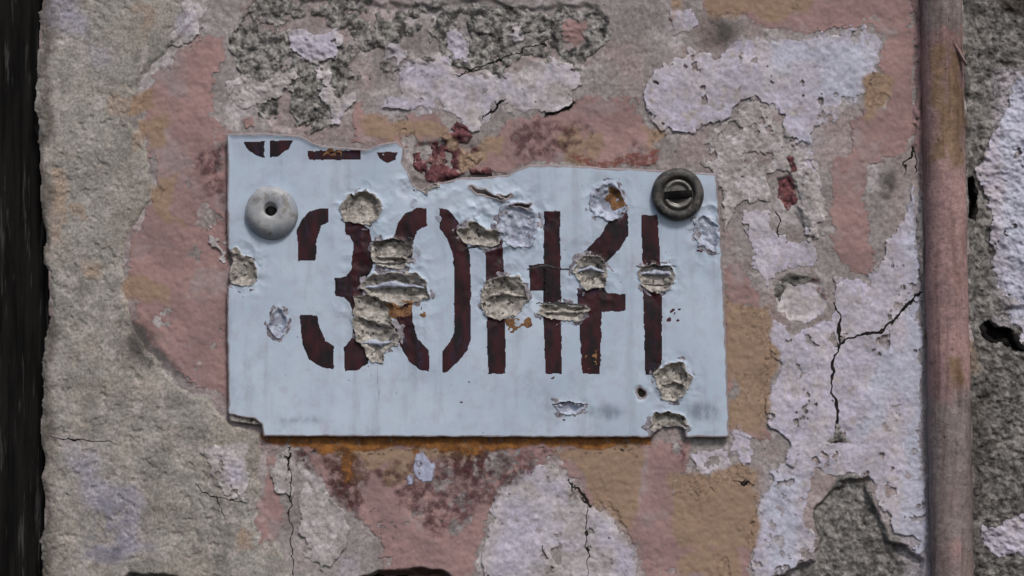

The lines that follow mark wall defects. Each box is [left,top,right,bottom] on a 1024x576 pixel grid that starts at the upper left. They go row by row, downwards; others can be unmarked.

flaking render [122,0,929,576]
flaking render [967,78,1024,352]
crack [830,291,923,442]
crack [286,446,294,576]
corrosion [261,434,651,530]
crack [568,479,592,576]